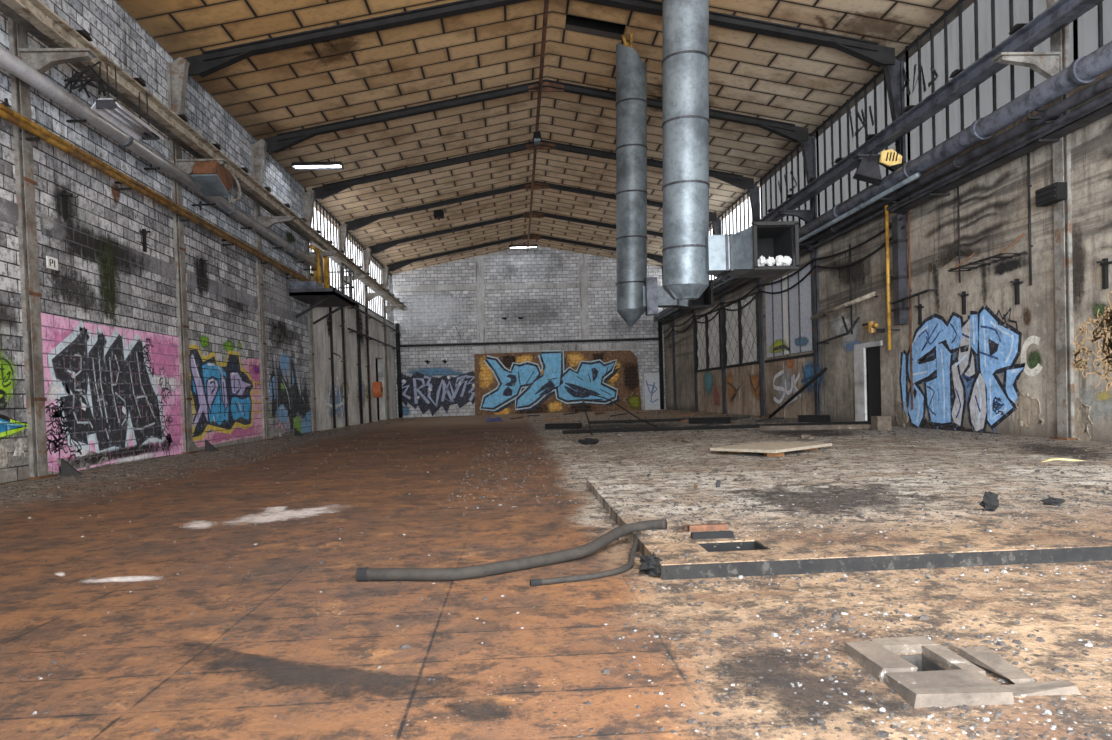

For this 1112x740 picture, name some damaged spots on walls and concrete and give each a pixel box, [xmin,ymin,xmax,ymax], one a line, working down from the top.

water stain [43,263,100,315]